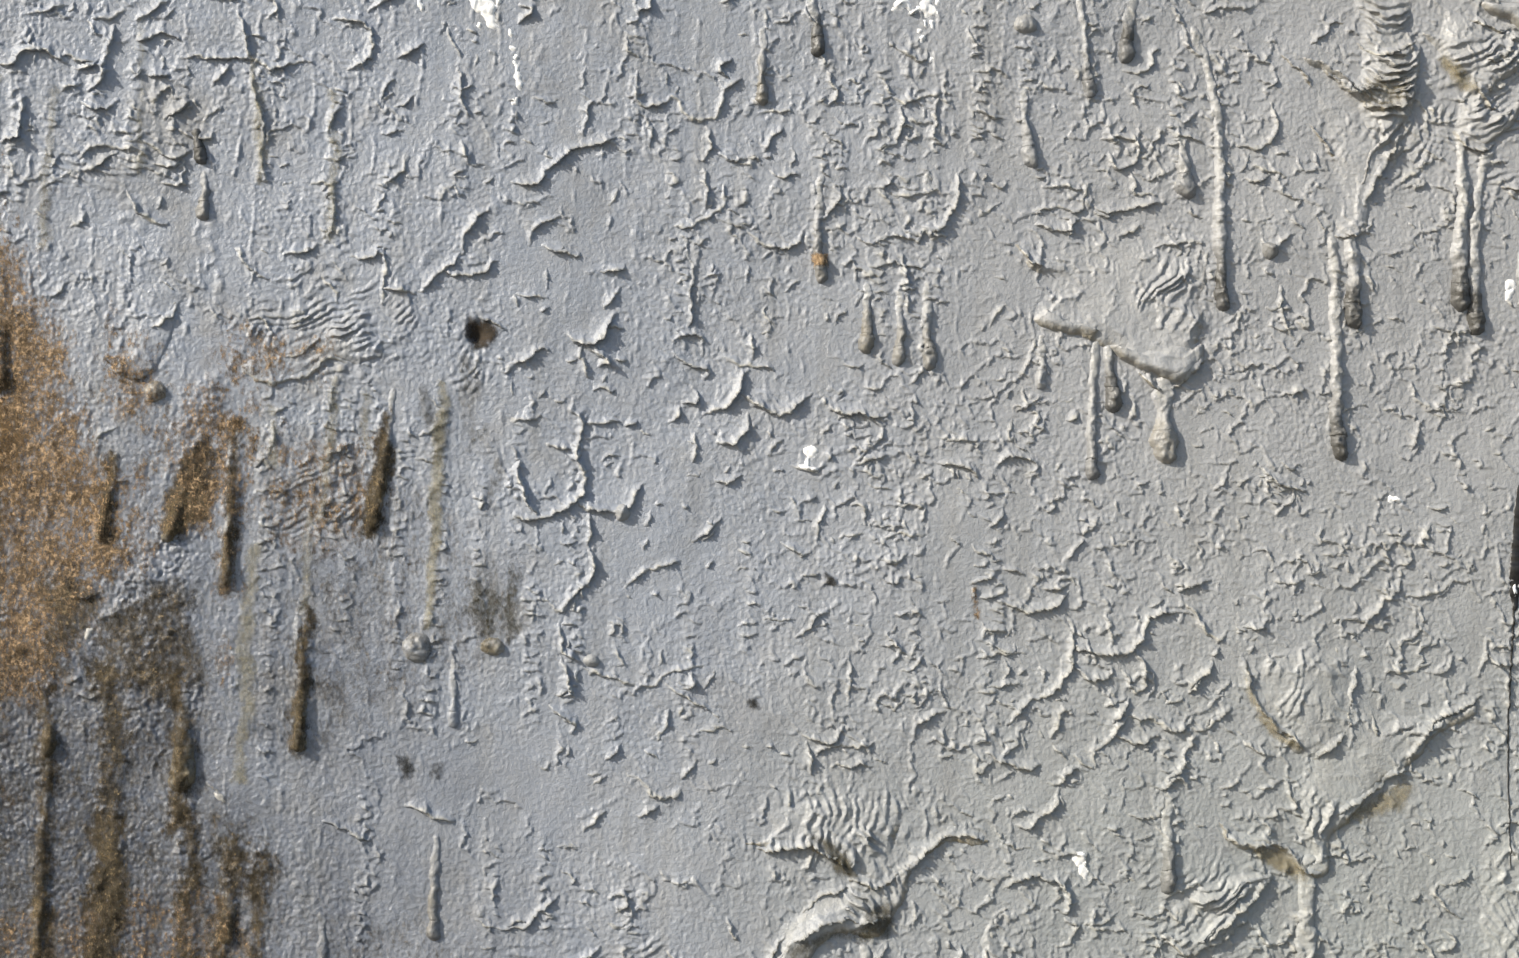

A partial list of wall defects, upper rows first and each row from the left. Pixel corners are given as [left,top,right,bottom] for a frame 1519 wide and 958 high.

crack [0,0,425,286]
crack [1490,151,1519,254]
crack [47,279,69,337]
crack [151,257,179,328]
crack [1360,327,1514,456]
crack [252,380,355,533]
crack [348,0,1469,958]
crack [65,673,102,711]
corrosion [0,217,395,958]
crack [1485,596,1519,690]
crack [321,816,372,842]
crack [1352,734,1519,958]